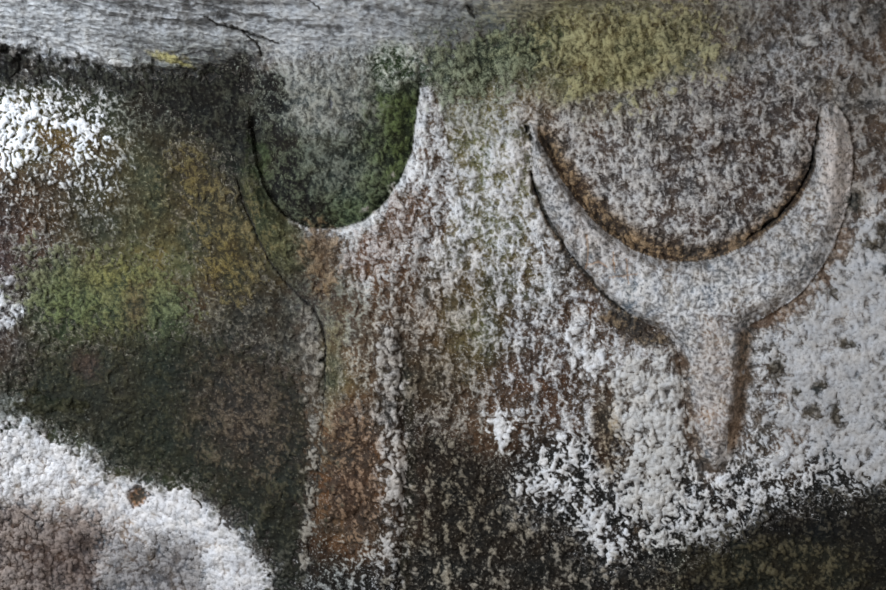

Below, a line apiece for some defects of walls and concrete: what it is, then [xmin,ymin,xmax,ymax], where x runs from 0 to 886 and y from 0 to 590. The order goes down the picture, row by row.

leakage [0,35,262,220]
leakage [0,275,24,329]
leakage [0,416,281,590]
leakage [291,305,329,571]
leakage [370,188,886,590]